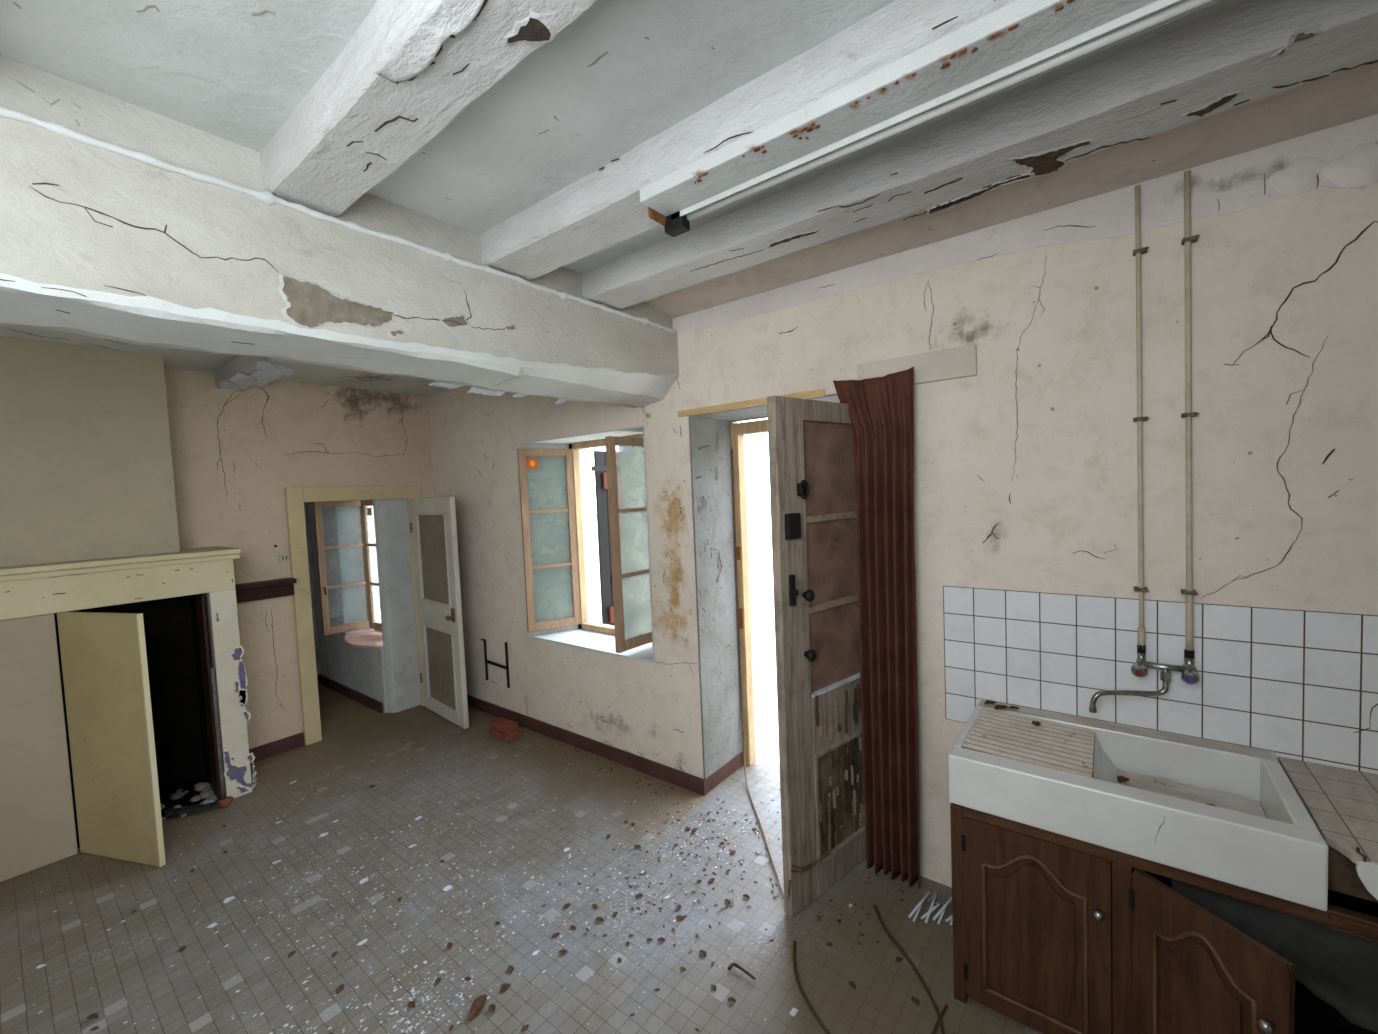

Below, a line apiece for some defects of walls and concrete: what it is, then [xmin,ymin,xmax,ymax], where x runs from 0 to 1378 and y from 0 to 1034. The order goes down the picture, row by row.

spalling [503,10,556,45]
corrosion [940,23,1019,70]
corrosion [789,123,820,140]
peeling [926,138,1094,215]
crack [29,182,279,273]
crack [0,279,146,314]
spalling [278,273,406,339]
crack [394,291,508,330]
crack [1012,225,1095,480]
crack [1201,221,1378,599]
peeling [229,646,251,723]
peeling [223,749,263,801]